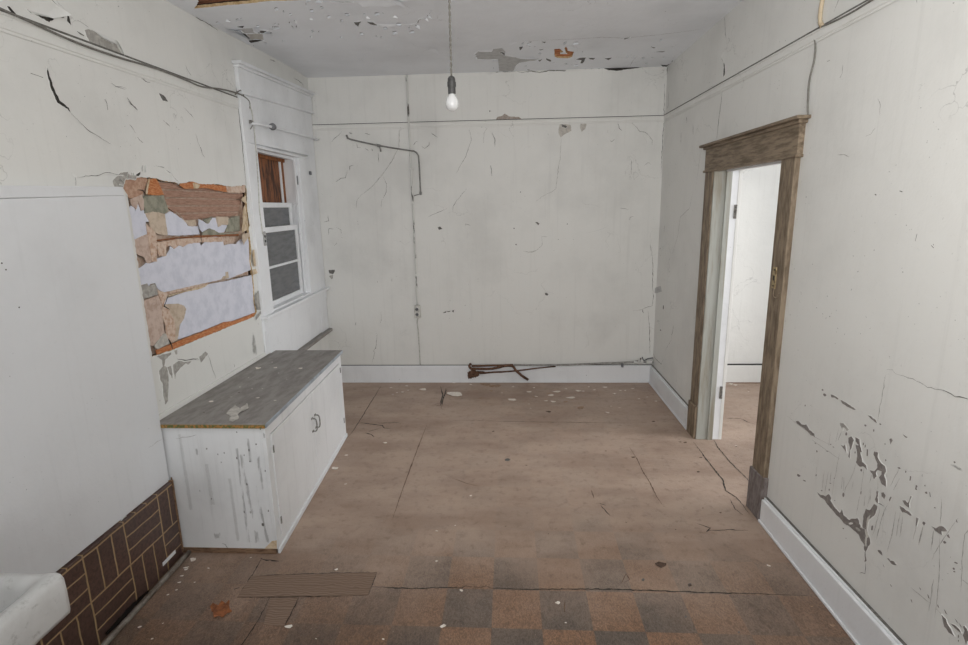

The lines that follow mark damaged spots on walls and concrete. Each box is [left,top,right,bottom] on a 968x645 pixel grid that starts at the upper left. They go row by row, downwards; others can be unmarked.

peeling [216,7,298,46]
peeling [473,41,613,72]
crack [31,66,110,144]
crack [105,78,168,143]
flaking render [112,165,261,405]
crack [878,369,967,417]
peeling [791,419,950,574]
peeling [919,587,968,645]